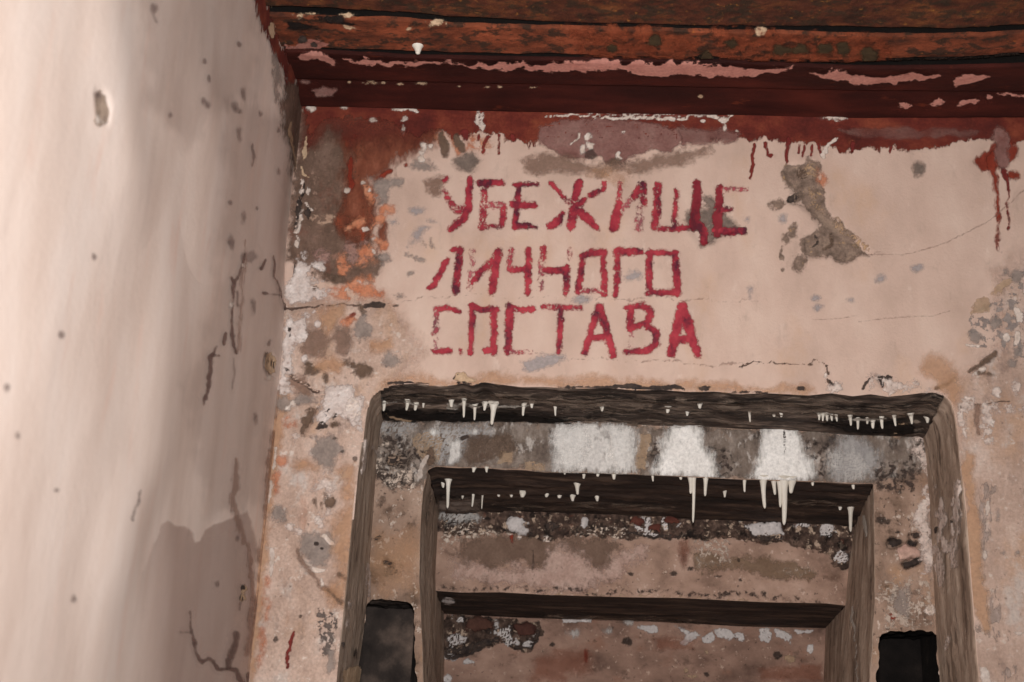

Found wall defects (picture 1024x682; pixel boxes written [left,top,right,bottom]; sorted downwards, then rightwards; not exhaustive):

spalling [95,90,109,126]
peeling [255,0,1024,272]
corrosion [975,127,1020,249]
crack [203,136,398,404]
efflorescence [446,402,534,410]
crack [739,359,831,386]
flaking render [239,299,855,682]
efflorescence [549,422,636,474]
efflorescence [651,425,717,477]
efflorescence [755,429,815,481]
flaking render [886,265,1024,682]
crack [190,612,250,682]